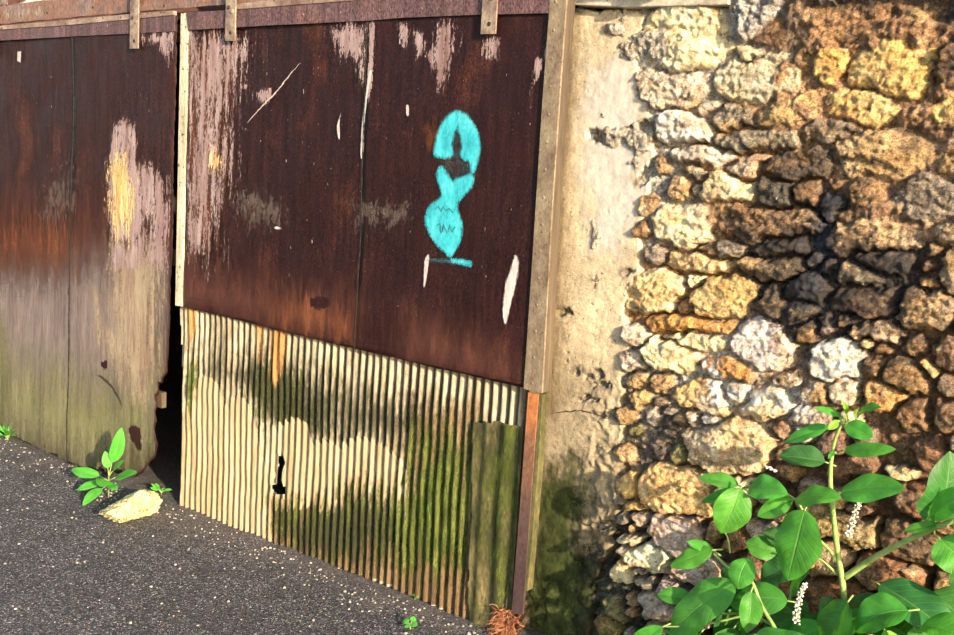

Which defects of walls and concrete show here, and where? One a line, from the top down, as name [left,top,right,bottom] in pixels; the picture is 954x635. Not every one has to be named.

peeling [331,22,375,98]
peeling [399,20,463,89]
peeling [481,37,500,60]
peeling [104,120,171,274]
corrosion [188,35,233,256]
peeling [184,29,272,275]
corrosion [426,123,437,151]
water stain [91,235,165,410]
corrosion [188,308,197,339]
corrosion [256,293,354,384]
spalling [573,366,618,422]
water stain [573,536,608,635]